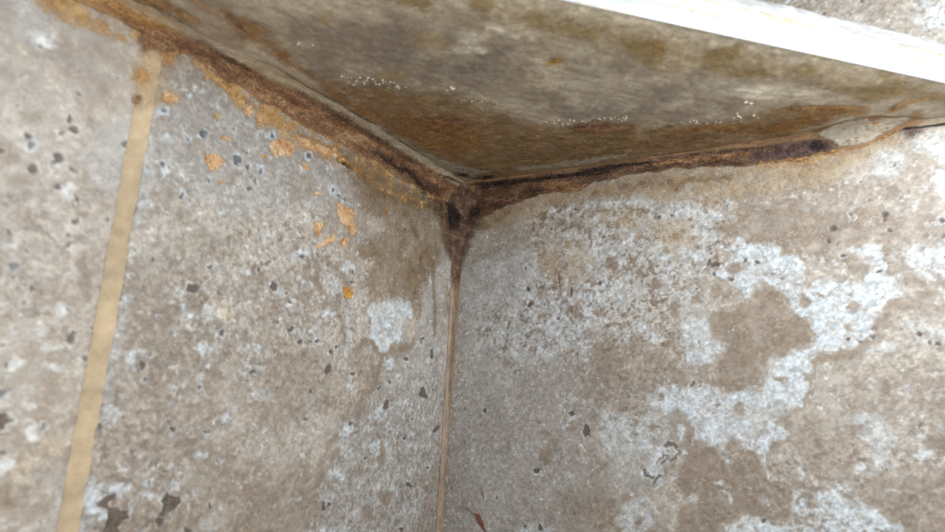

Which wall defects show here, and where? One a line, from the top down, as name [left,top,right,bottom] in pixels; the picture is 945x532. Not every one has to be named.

leakage [340,76,406,89]
leakage [825,71,945,102]
rust [36,0,898,286]
mould [747,139,836,162]
leakage [456,161,652,186]
leakage [448,200,480,231]